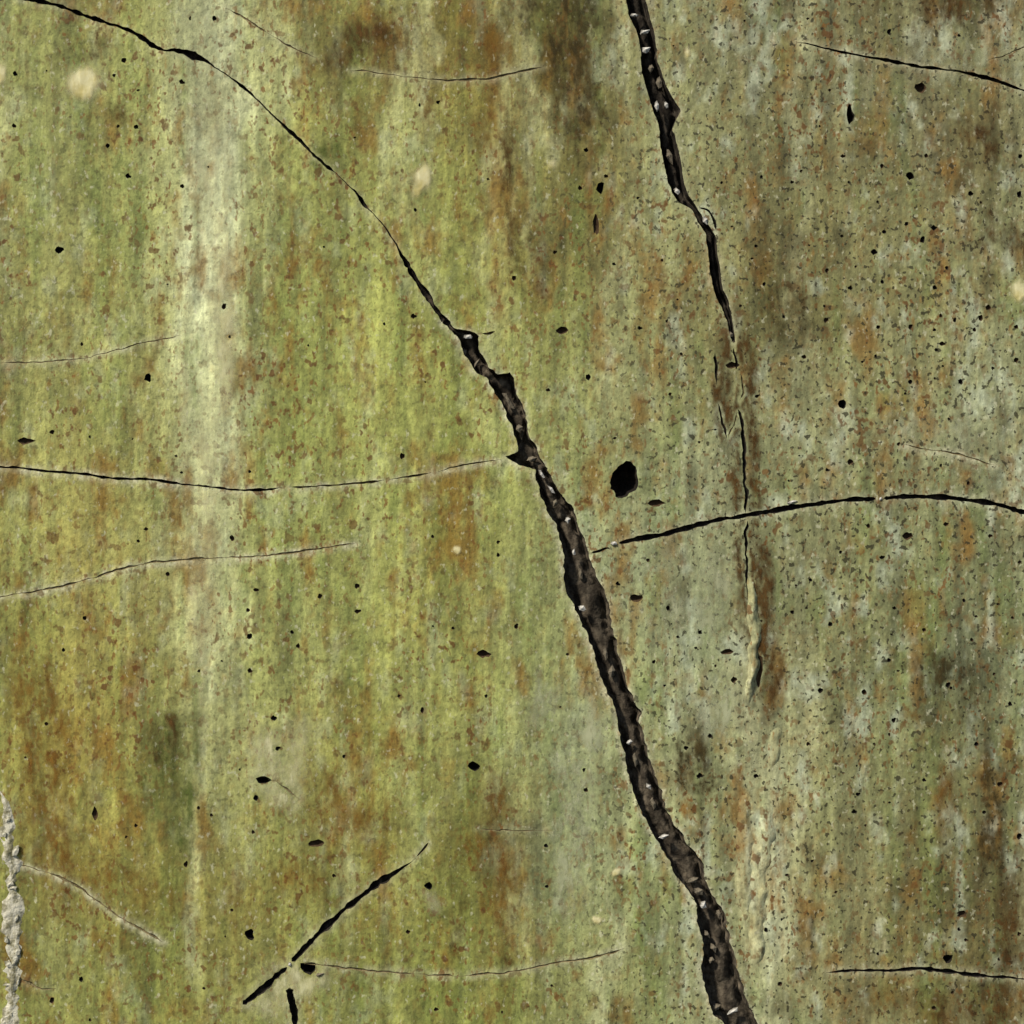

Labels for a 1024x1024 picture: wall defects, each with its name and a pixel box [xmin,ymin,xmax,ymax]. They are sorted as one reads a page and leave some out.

crack [798,42,1024,91]
crack [0,0,758,1024]
crack [611,404,1024,599]
crack [826,966,1024,980]